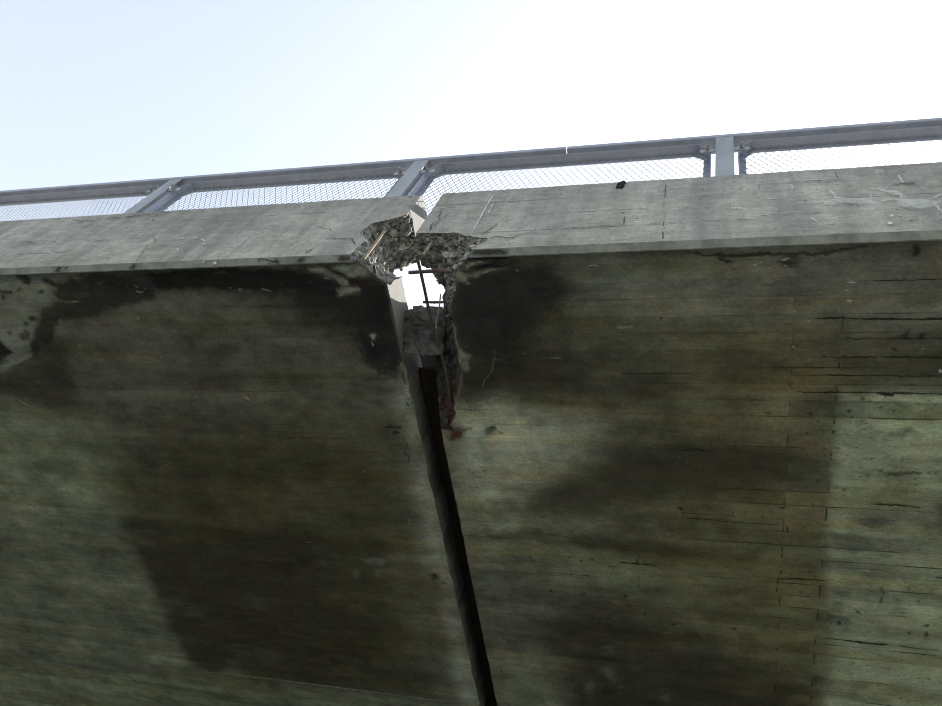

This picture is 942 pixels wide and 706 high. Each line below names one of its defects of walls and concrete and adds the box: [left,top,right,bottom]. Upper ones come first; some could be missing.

leakage [0,255,401,370]
spalling [351,211,488,430]
leakage [451,249,566,390]
leakage [697,246,867,266]
crack [797,317,942,397]
crack [866,276,937,284]